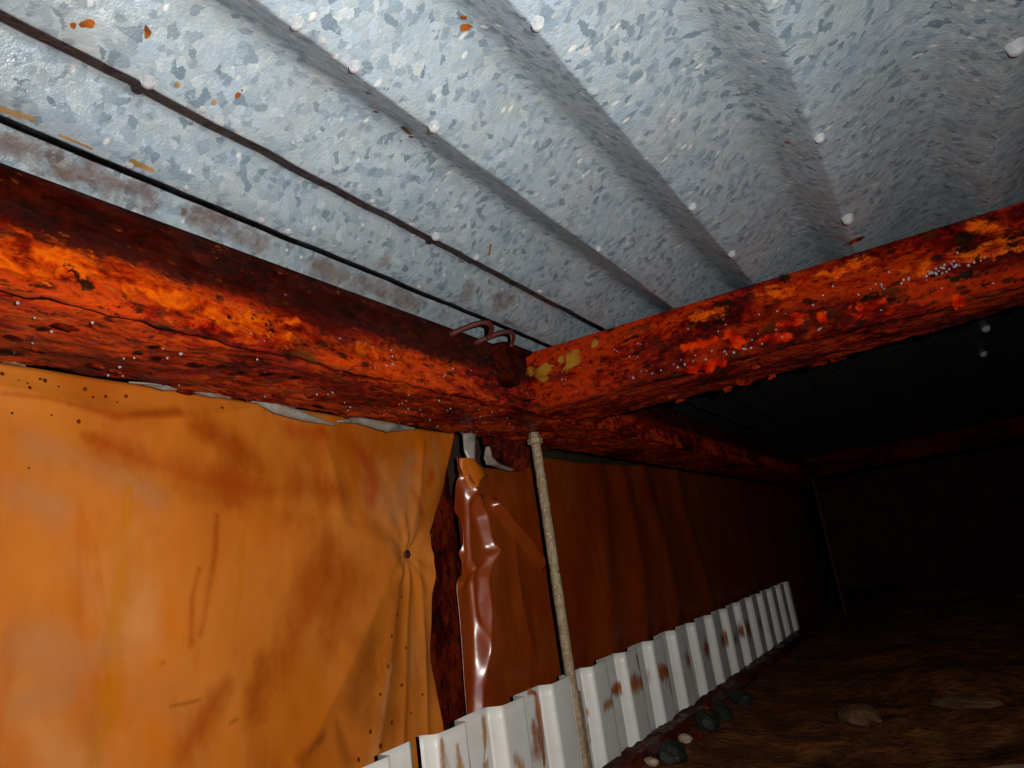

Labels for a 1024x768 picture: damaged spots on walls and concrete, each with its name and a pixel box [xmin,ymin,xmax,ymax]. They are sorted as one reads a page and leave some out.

rust [129,159,155,172]
rust [51,323,81,332]
rust [723,365,777,393]
rust [604,656,643,709]
rust [657,665,673,697]
rust [528,689,545,766]